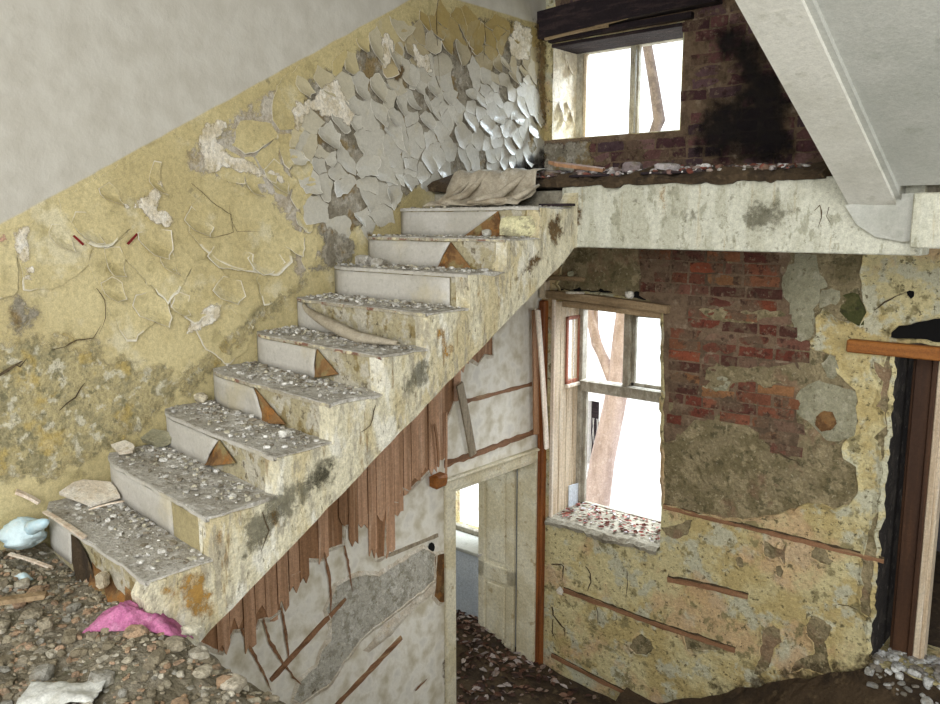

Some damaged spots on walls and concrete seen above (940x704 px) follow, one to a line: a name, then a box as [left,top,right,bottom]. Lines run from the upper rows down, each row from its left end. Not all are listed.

crack [51,288,106,351]
crack [195,186,252,238]
leakage [243,458,335,558]
spalling [197,335,494,704]
peeling [0,0,824,482]
spalling [555,247,897,658]